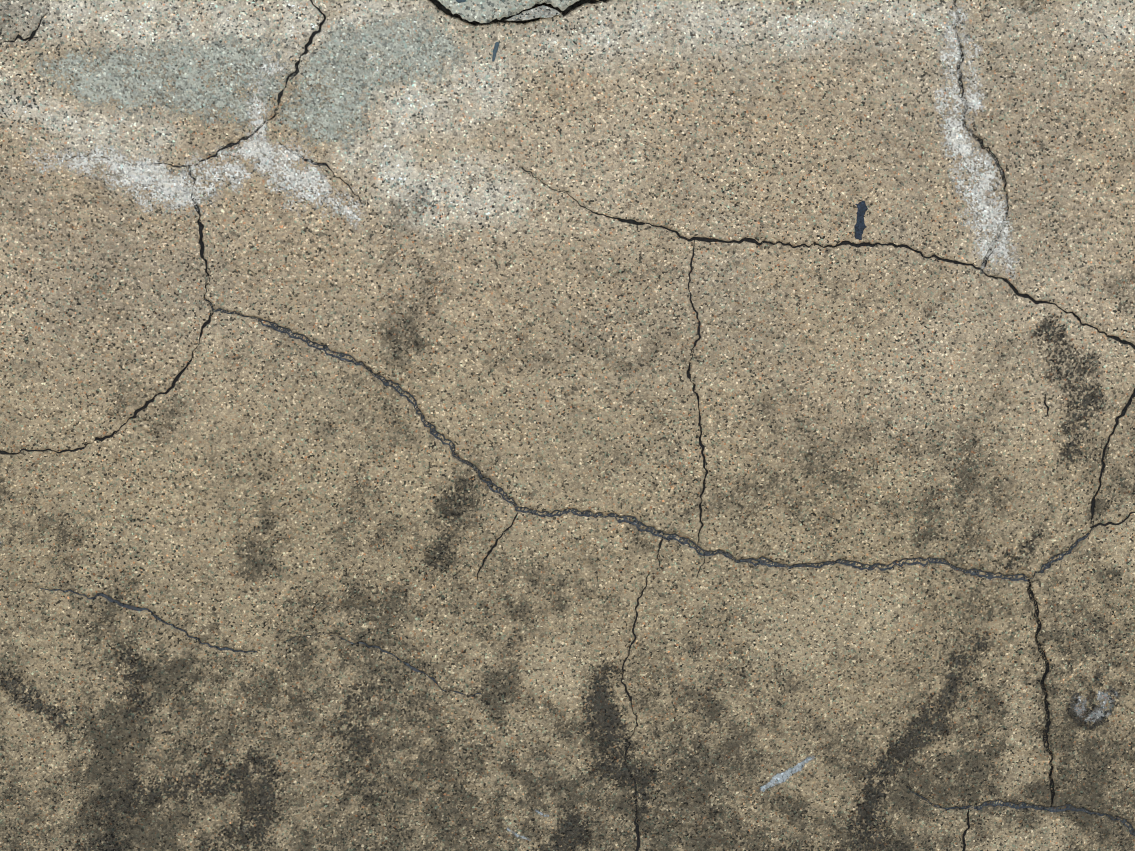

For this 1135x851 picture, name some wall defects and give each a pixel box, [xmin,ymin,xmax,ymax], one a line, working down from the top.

crack [4,14,46,44]
leakage [30,56,361,225]
crack [96,0,326,186]
crack [279,142,362,204]
crack [430,0,607,25]
leakage [935,3,1018,276]
crack [954,0,1009,221]
crack [0,193,1135,851]